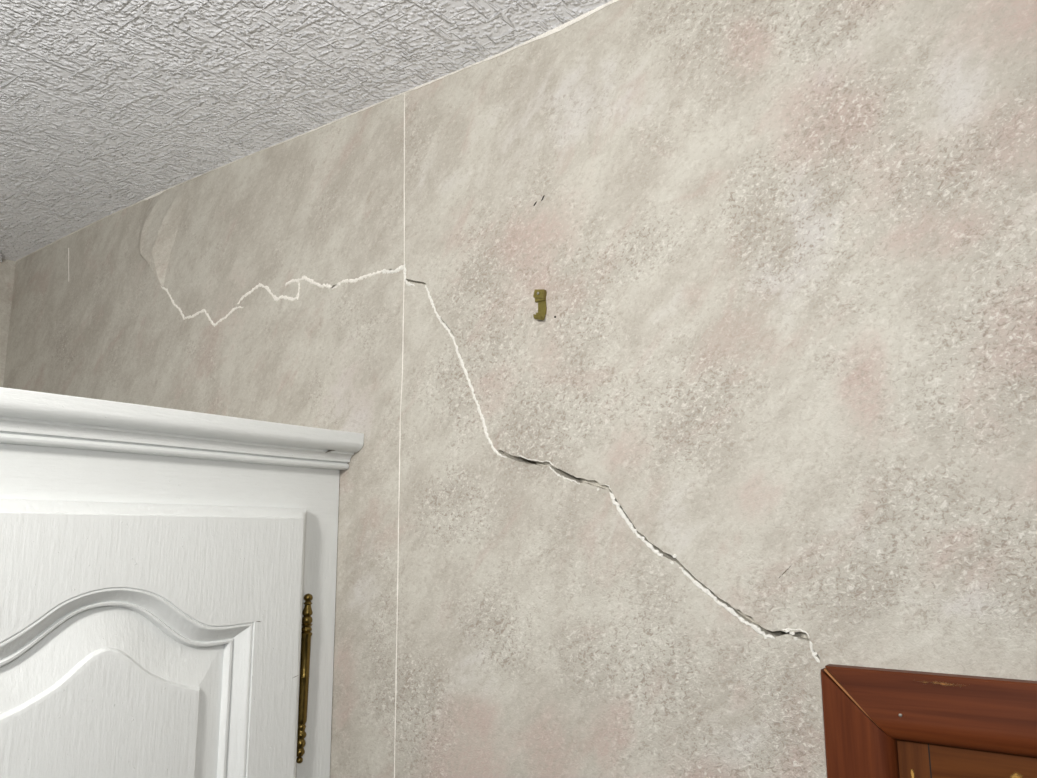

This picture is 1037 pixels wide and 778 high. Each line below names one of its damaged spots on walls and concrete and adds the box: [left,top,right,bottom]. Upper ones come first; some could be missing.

crack [161,264,820,663]